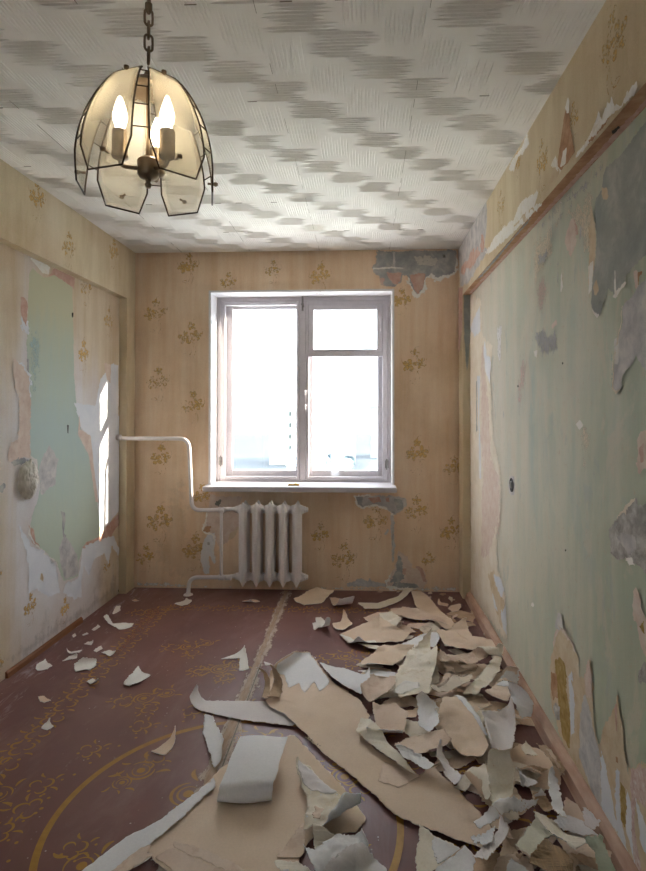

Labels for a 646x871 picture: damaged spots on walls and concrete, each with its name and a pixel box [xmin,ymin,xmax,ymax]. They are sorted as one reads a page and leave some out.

spalling [372,83,646,368]
spalling [354,494,407,516]
spalling [385,551,428,591]
spalling [609,498,646,574]
peeling [632,587,646,684]